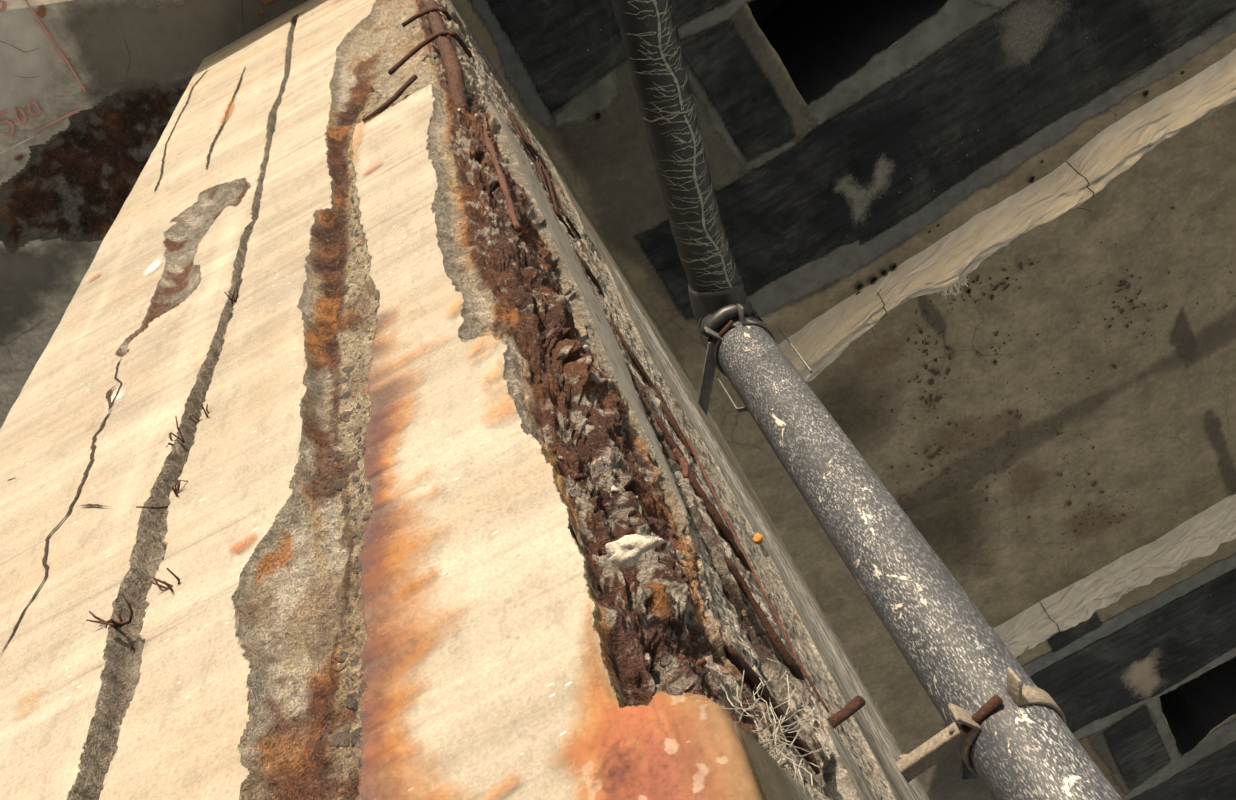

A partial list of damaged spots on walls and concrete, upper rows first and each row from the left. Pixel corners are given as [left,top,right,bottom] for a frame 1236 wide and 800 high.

spalling [0,75,192,250]
spalling [115,177,251,357]
corrosion [483,131,523,233]
crack [66,13,299,800]
spalling [231,0,896,800]
crack [0,359,122,654]
corrosion [231,535,255,552]
corrosion [358,316,447,800]
corrosion [562,621,764,800]